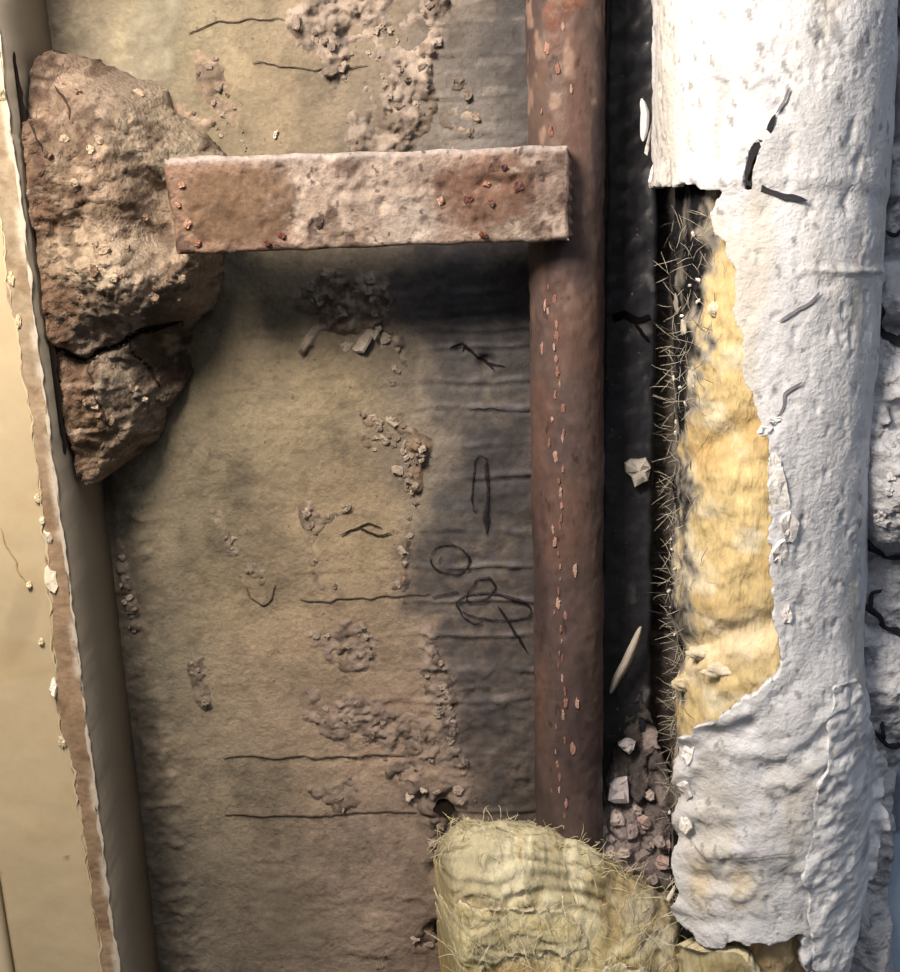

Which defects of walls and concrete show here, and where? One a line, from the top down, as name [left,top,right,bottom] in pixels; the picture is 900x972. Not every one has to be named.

spalling [285,0,480,152]
crack [743,87,807,202]
corrosion [434,164,527,238]
spalling [293,267,408,387]
peeling [757,416,782,437]
water stain [388,242,535,821]
peeling [767,453,799,565]
peeling [780,604,792,623]
peeling [676,781,692,800]
peeling [679,816,692,834]
peeling [681,745,695,766]